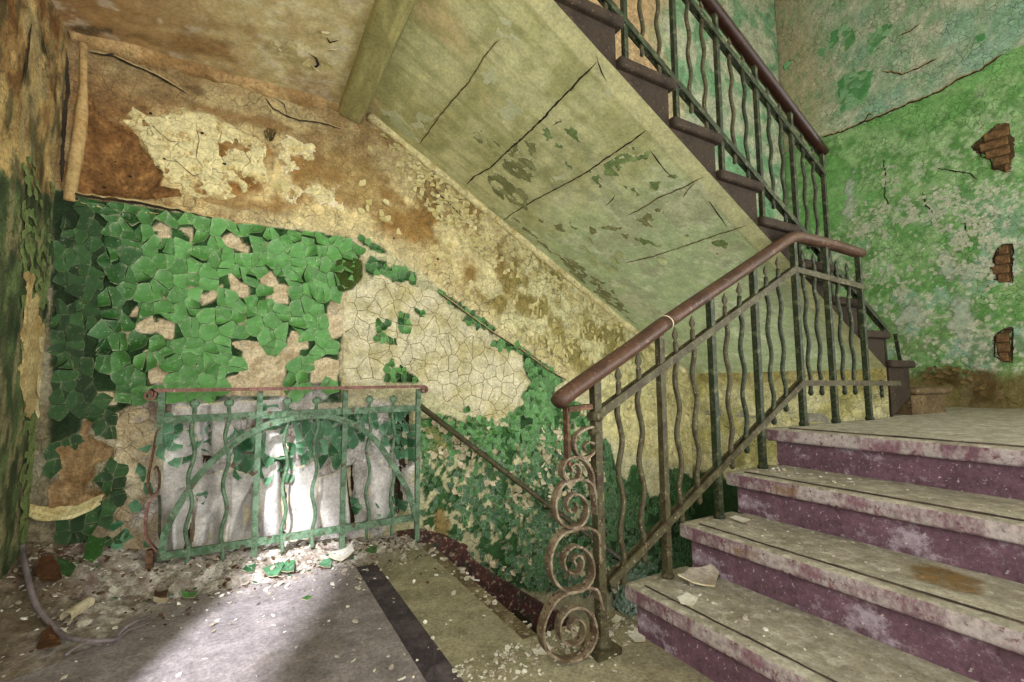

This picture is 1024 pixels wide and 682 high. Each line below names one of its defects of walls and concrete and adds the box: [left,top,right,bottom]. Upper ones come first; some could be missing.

crack [24,24,251,227]
crack [265,98,341,129]
flaking render [18,94,719,642]
crack [343,272,567,426]
crack [420,40,499,143]
crack [436,59,607,218]
crack [503,131,745,263]
peeling [710,239,729,257]
crack [820,52,1003,137]
peeling [838,165,1014,401]
flaking render [971,122,1015,173]
damp [913,565,981,594]